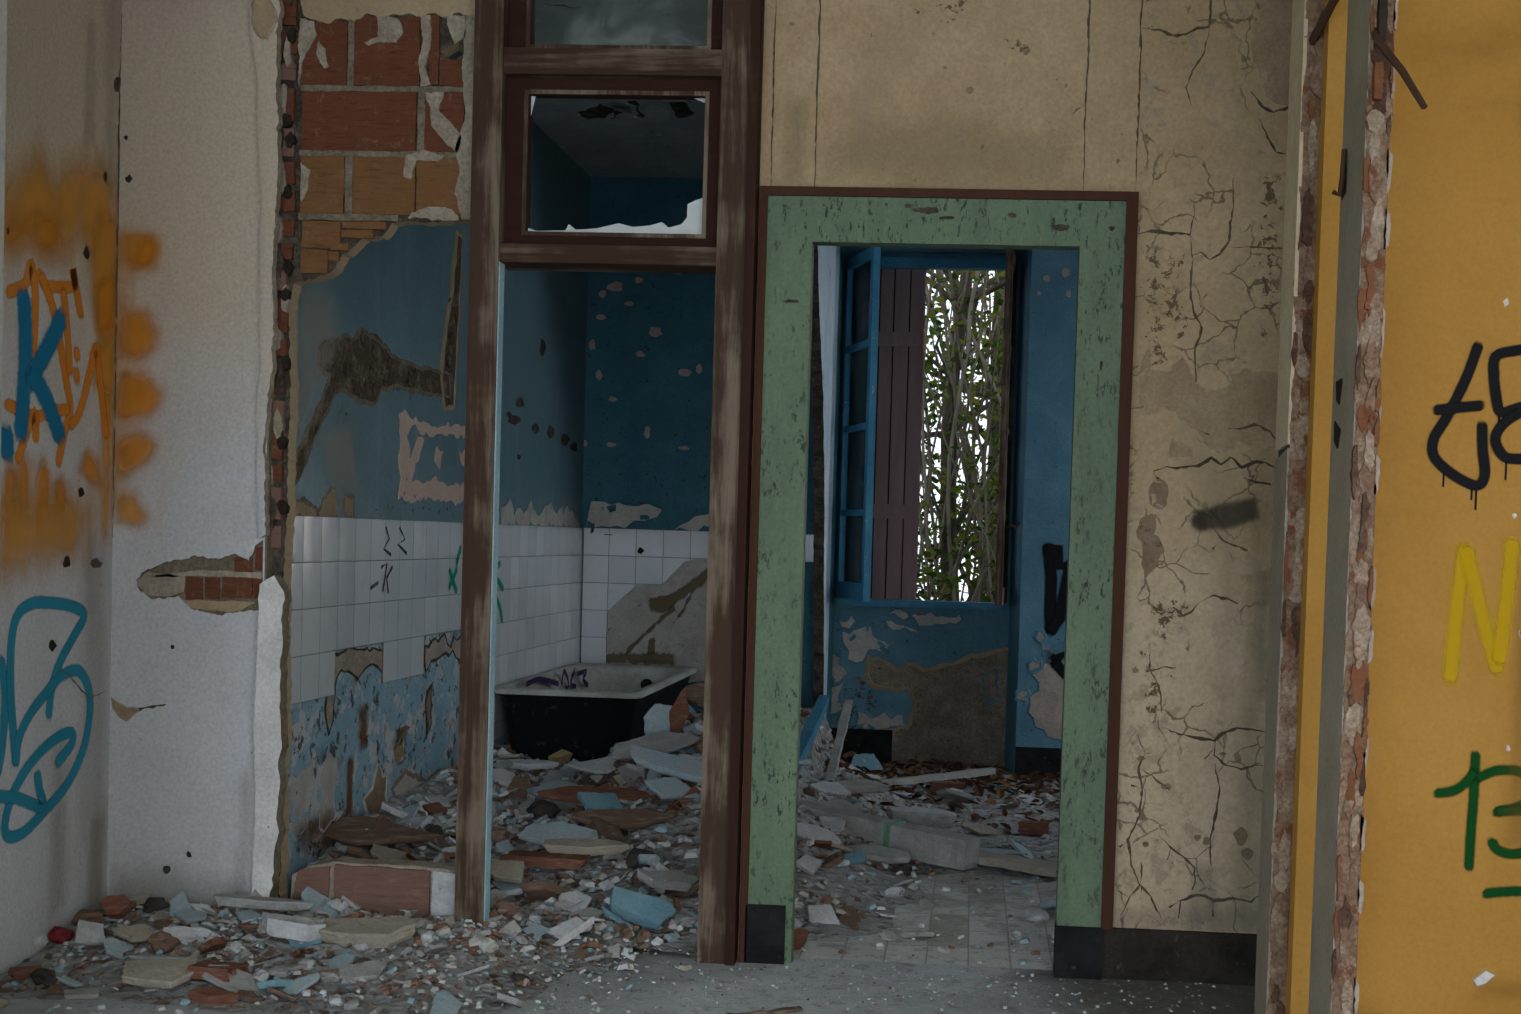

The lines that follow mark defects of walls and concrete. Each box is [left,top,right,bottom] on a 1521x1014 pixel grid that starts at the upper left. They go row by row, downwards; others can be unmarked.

crack [1135,0,1212,191]
crack [1251,92,1288,154]
flaking render [137,0,475,613]
crack [1138,178,1283,382]
peeling [288,647,383,843]
peeling [363,633,461,814]
peeling [606,559,708,683]
peeling [831,607,965,730]
peeling [981,628,1065,741]
crack [1118,594,1265,919]
crack [1153,423,1276,485]
crack [1211,528,1248,551]